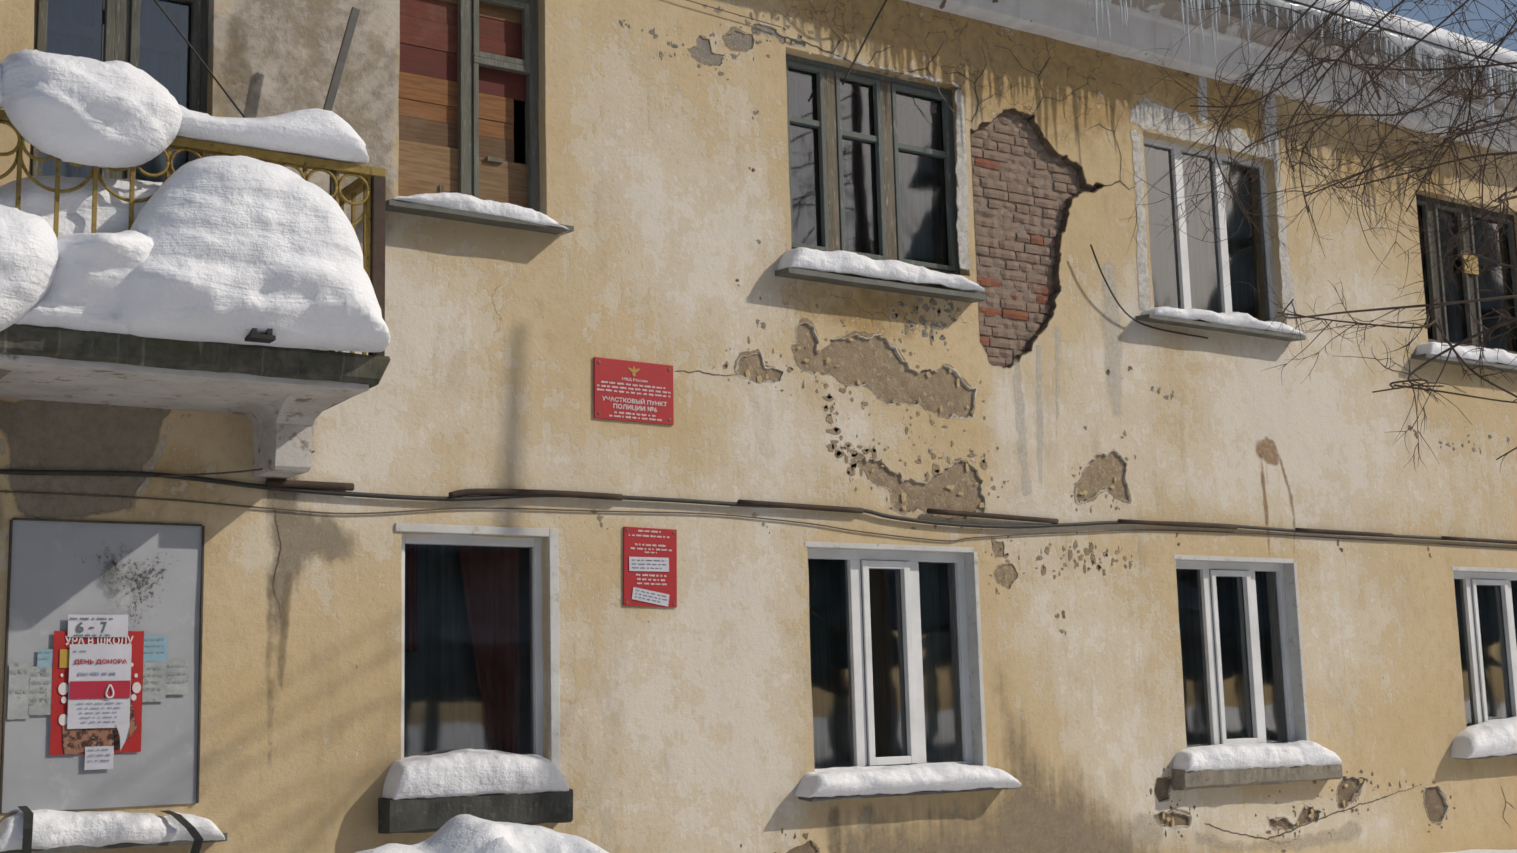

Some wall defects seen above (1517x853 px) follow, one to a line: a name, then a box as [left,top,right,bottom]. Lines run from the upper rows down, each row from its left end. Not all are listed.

peeling [619,4,814,80]
flaking render [970,108,1107,368]
peeling [723,295,1136,599]
water stain [268,476,349,625]
peeling [774,828,820,853]
water stain [838,732,1132,853]
peeling [1146,766,1198,838]
peeling [1255,769,1455,853]